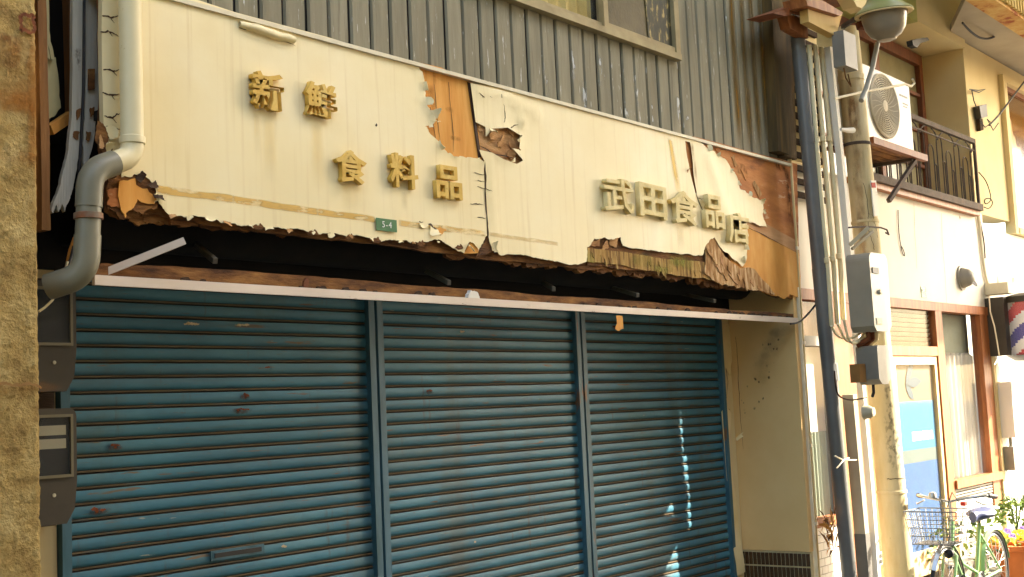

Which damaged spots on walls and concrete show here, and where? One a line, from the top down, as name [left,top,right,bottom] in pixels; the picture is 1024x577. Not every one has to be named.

spalling [36,0,76,271]
spalling [73,110,119,187]
peeling [419,63,523,164]
peeling [135,171,165,201]
spalling [169,214,232,226]
spalling [307,229,354,240]
spalling [100,249,729,310]
crack [472,165,492,237]
peeling [591,238,618,250]
peeling [692,136,801,299]